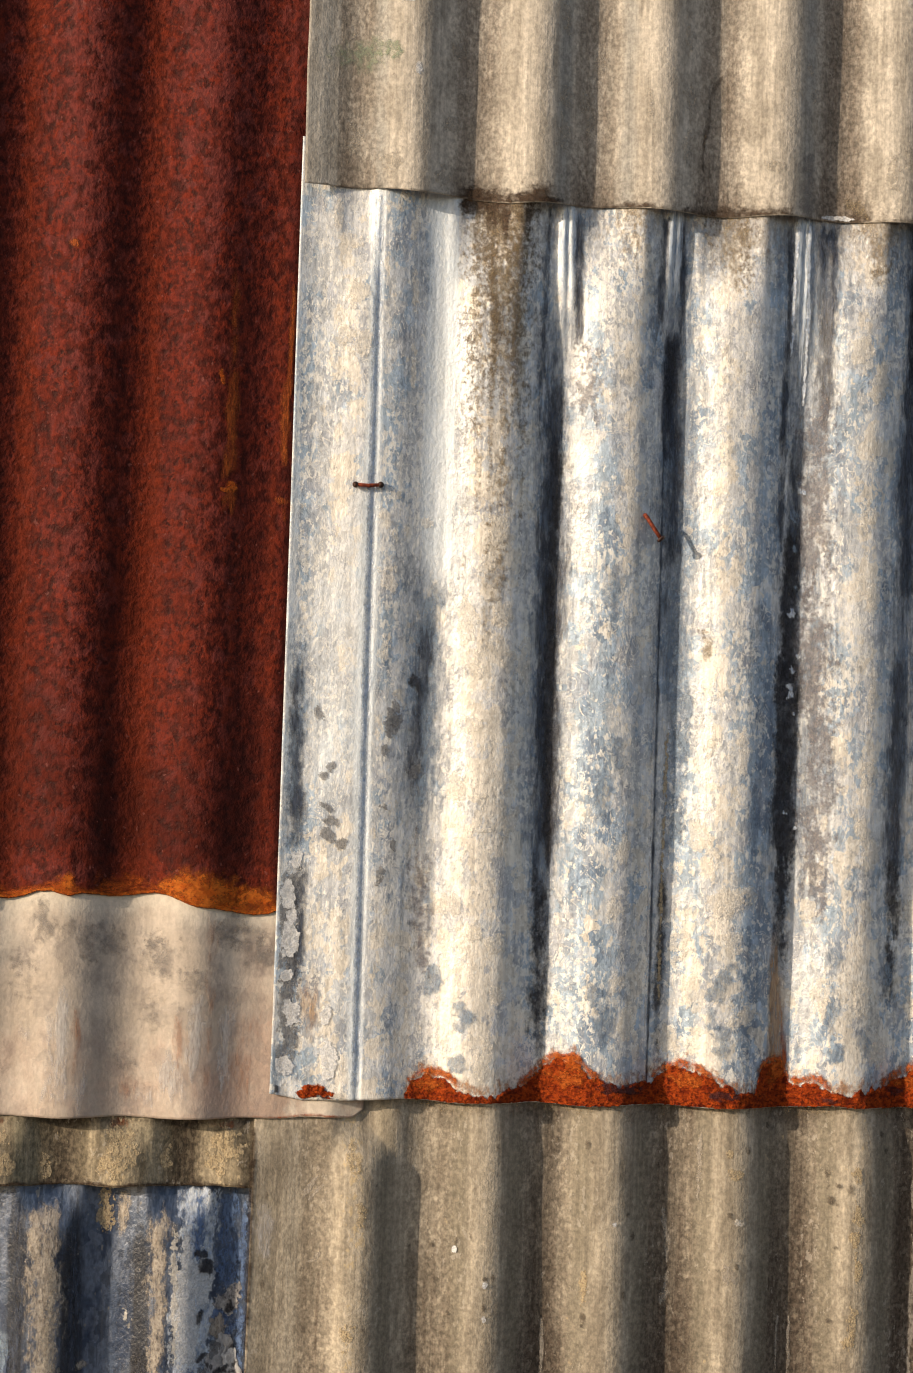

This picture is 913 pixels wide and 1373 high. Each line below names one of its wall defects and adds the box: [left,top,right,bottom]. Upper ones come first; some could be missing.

corrosion [219,369,238,512]
corrosion [280,289,296,464]
leakage [351,194,384,1087]
leakage [461,202,602,1049]
leakage [748,158,913,1001]
corrosion [0,874,276,915]
leakage [258,642,310,1059]
corrosion [404,944,913,1109]
peeling [0,1337,9,1373]
peeling [23,1204,67,1373]
peeling [95,1116,141,1234]
peeling [145,1129,248,1373]